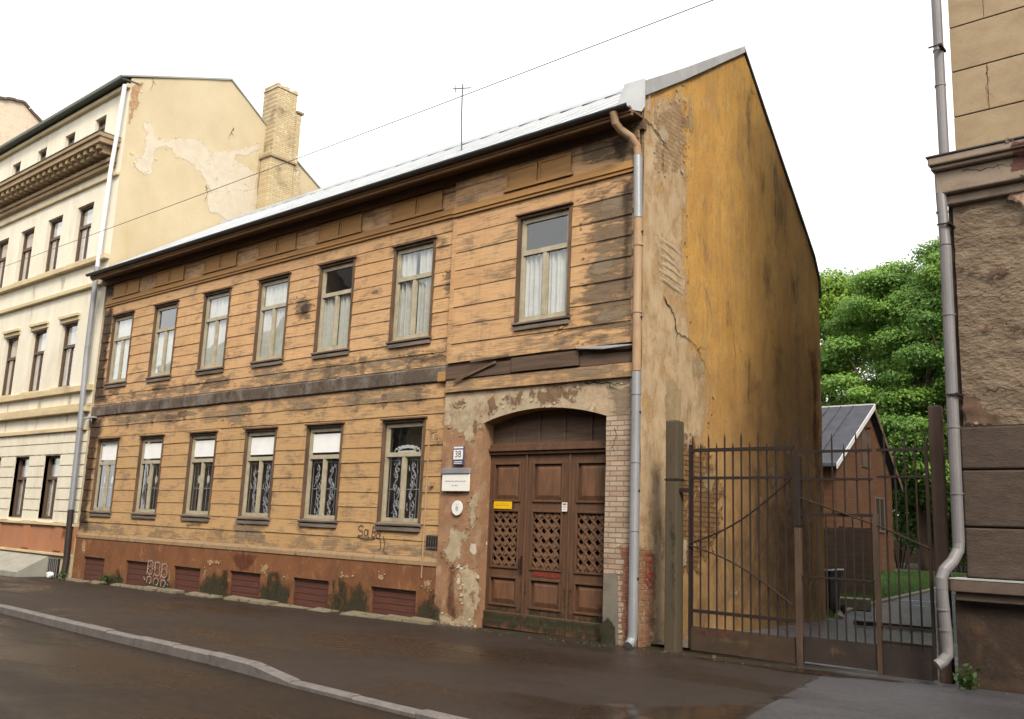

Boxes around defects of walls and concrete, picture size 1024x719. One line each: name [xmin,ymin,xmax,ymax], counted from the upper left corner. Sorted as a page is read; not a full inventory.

flaking render [129,83,259,220]
flaking render [447,83,724,647]
crack [664,289,737,394]
flaking render [347,493,480,627]
damp [596,608,615,645]